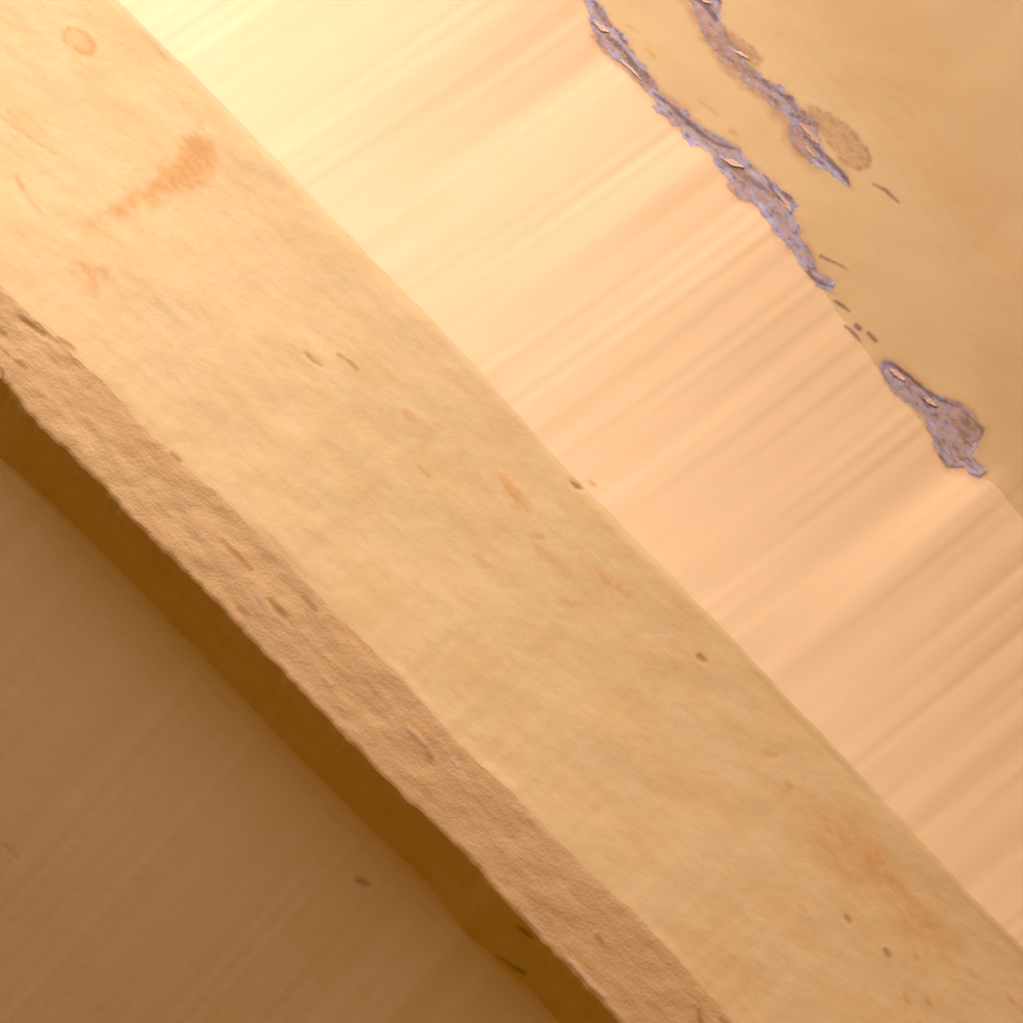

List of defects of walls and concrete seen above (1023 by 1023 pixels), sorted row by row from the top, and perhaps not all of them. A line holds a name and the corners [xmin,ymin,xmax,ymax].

peeling [586,0,865,308]
peeling [880,361,986,478]